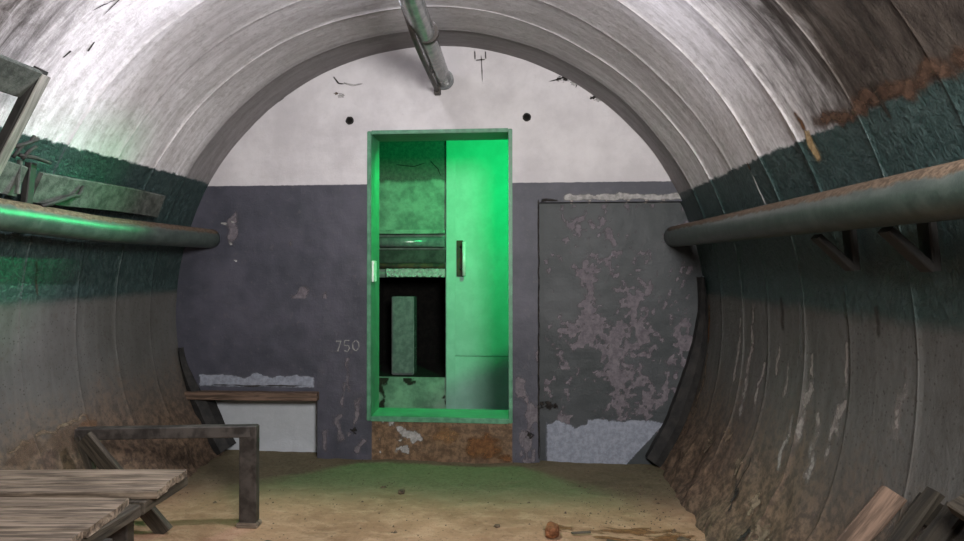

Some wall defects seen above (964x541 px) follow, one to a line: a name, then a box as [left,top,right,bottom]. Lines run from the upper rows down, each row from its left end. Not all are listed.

peeling [199,373,314,388]
peeling [515,192,693,464]
leakage [732,311,789,416]
leakage [778,353,847,479]